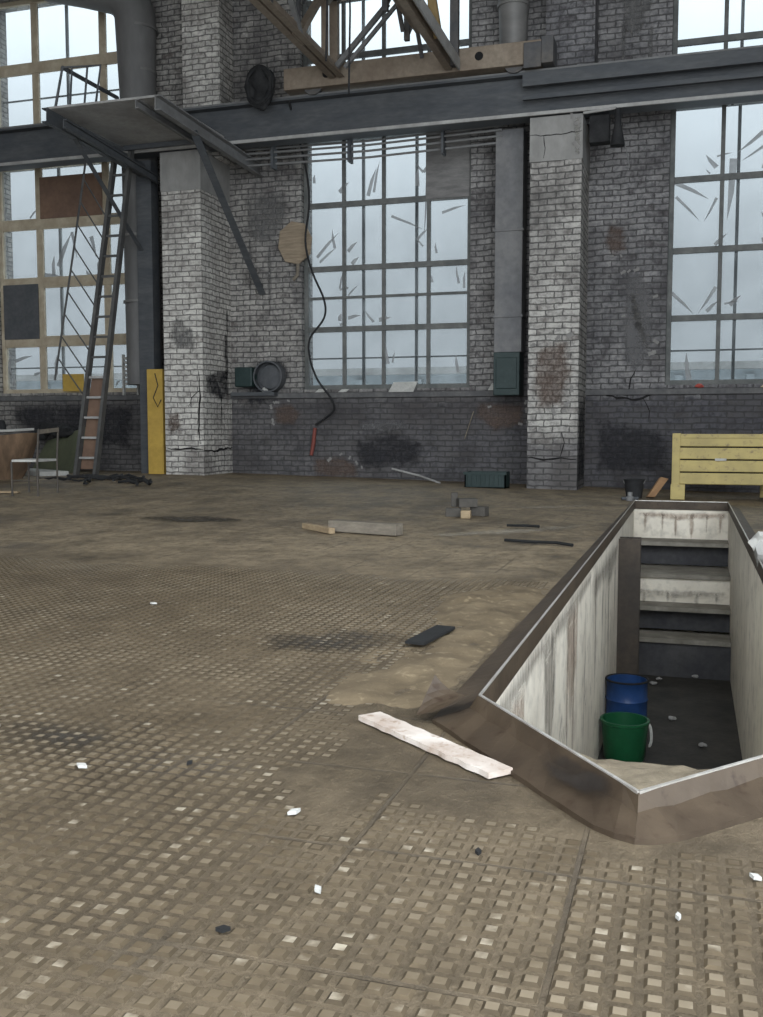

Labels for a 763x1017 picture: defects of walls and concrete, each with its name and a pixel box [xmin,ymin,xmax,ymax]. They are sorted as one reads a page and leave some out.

damp [528,591,582,722]